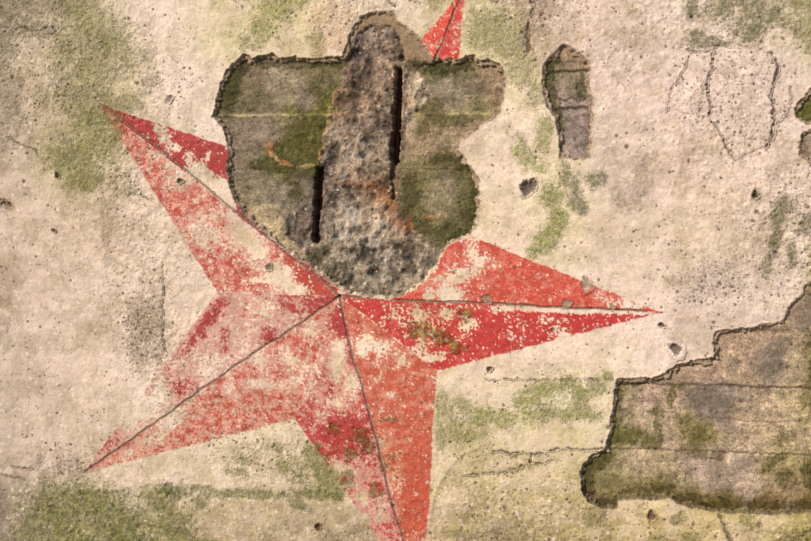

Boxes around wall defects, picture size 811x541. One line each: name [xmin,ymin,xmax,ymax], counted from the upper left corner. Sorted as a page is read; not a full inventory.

corrosion [264,86,448,251]
spalling [211,9,507,300]
corrosion [385,68,408,171]
spalling [541,43,595,161]
crack [664,47,736,161]
crack [763,51,793,151]
spalling [794,87,811,165]
spalling [581,275,595,295]
spalling [579,280,811,516]
crack [462,446,605,477]